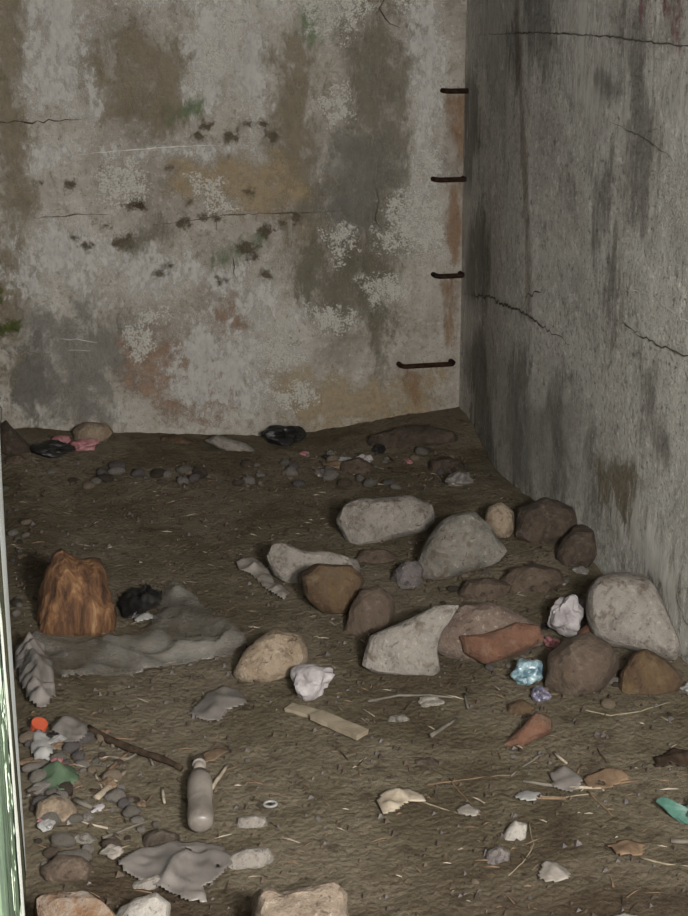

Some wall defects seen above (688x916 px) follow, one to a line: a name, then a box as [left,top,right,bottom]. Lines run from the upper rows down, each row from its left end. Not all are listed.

water stain [0,0,450,429]
crack [465,291,570,345]
crack [477,32,688,47]
water stain [0,444,26,916]